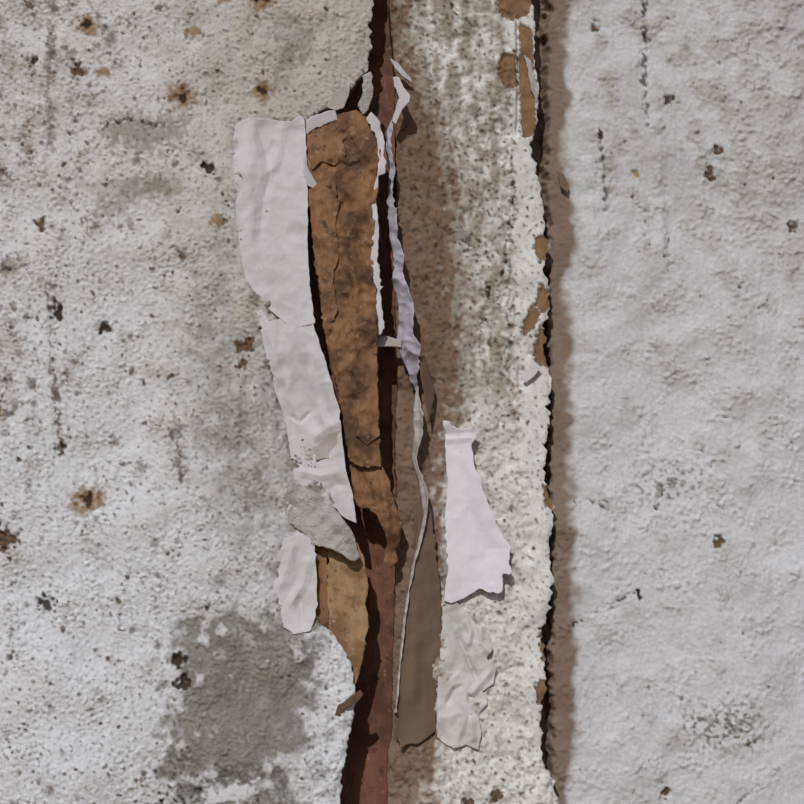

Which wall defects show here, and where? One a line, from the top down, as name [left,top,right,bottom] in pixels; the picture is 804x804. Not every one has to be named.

spalling [357,72,374,115]
spalling [497,0,536,138]
spalling [534,236,549,264]
hole [234,337,254,369]
spalling [521,284,550,368]
peeling [282,483,360,562]